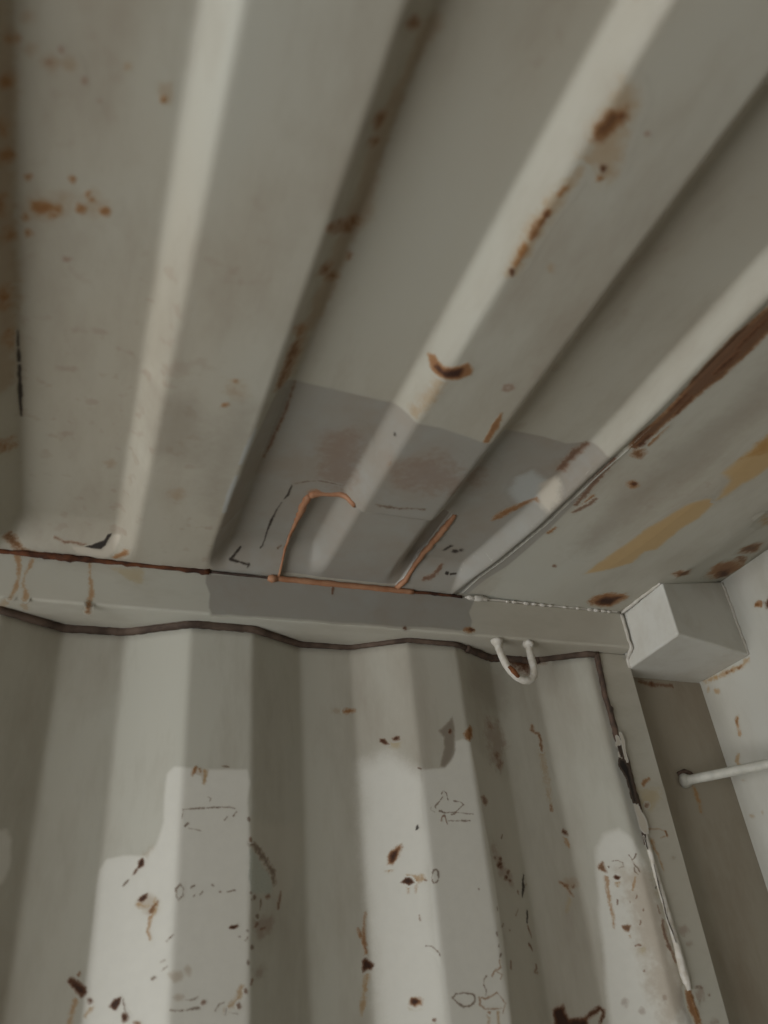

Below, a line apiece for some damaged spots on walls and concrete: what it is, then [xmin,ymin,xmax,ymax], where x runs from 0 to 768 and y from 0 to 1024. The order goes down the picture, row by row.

corrosion [0,0,125,398]
corrosion [267,1,453,399]
corrosion [496,57,654,284]
corrosion [403,348,477,423]
corrosion [569,304,768,516]
corrosion [0,527,45,613]
corrosion [582,590,633,609]
corrosion [667,511,768,582]
corrosion [380,841,429,896]